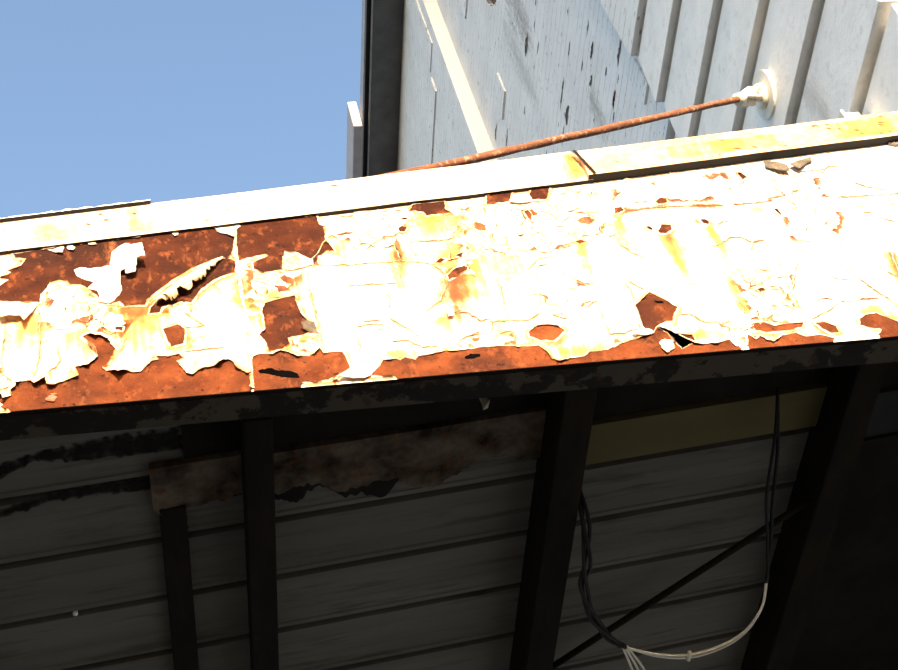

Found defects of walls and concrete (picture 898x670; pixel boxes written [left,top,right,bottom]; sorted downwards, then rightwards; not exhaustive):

peeling [398,201,454,234]
peeling [483,188,553,221]
rust [614,204,667,248]
crack [214,166,898,352]
rust [660,234,688,277]
rust [884,252,898,283]
rust [16,314,47,346]
rust [102,300,169,352]
peeling [0,215,844,411]
peeling [855,312,898,337]
damp [0,426,183,479]
damp [0,475,151,517]